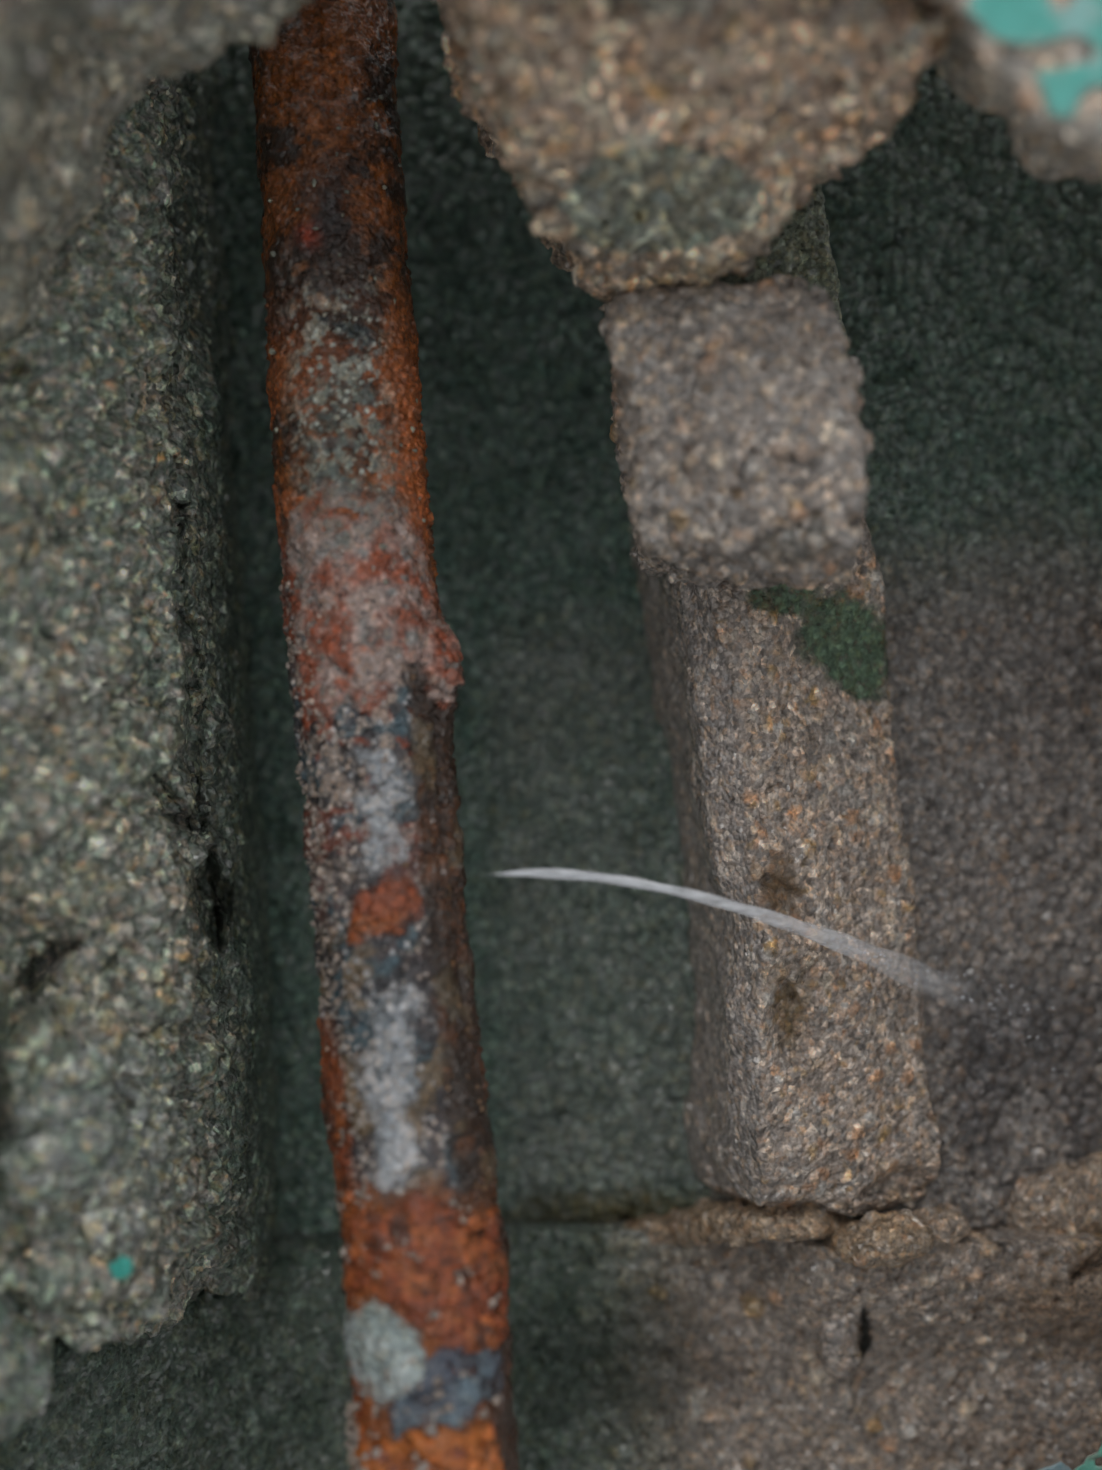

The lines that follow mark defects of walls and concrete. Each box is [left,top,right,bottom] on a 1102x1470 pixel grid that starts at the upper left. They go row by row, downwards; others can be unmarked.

spalling [0,320,244,1314]
spalling [0,0,312,223]
spalling [436,0,1102,1216]
peeling [1037,1442,1102,1470]